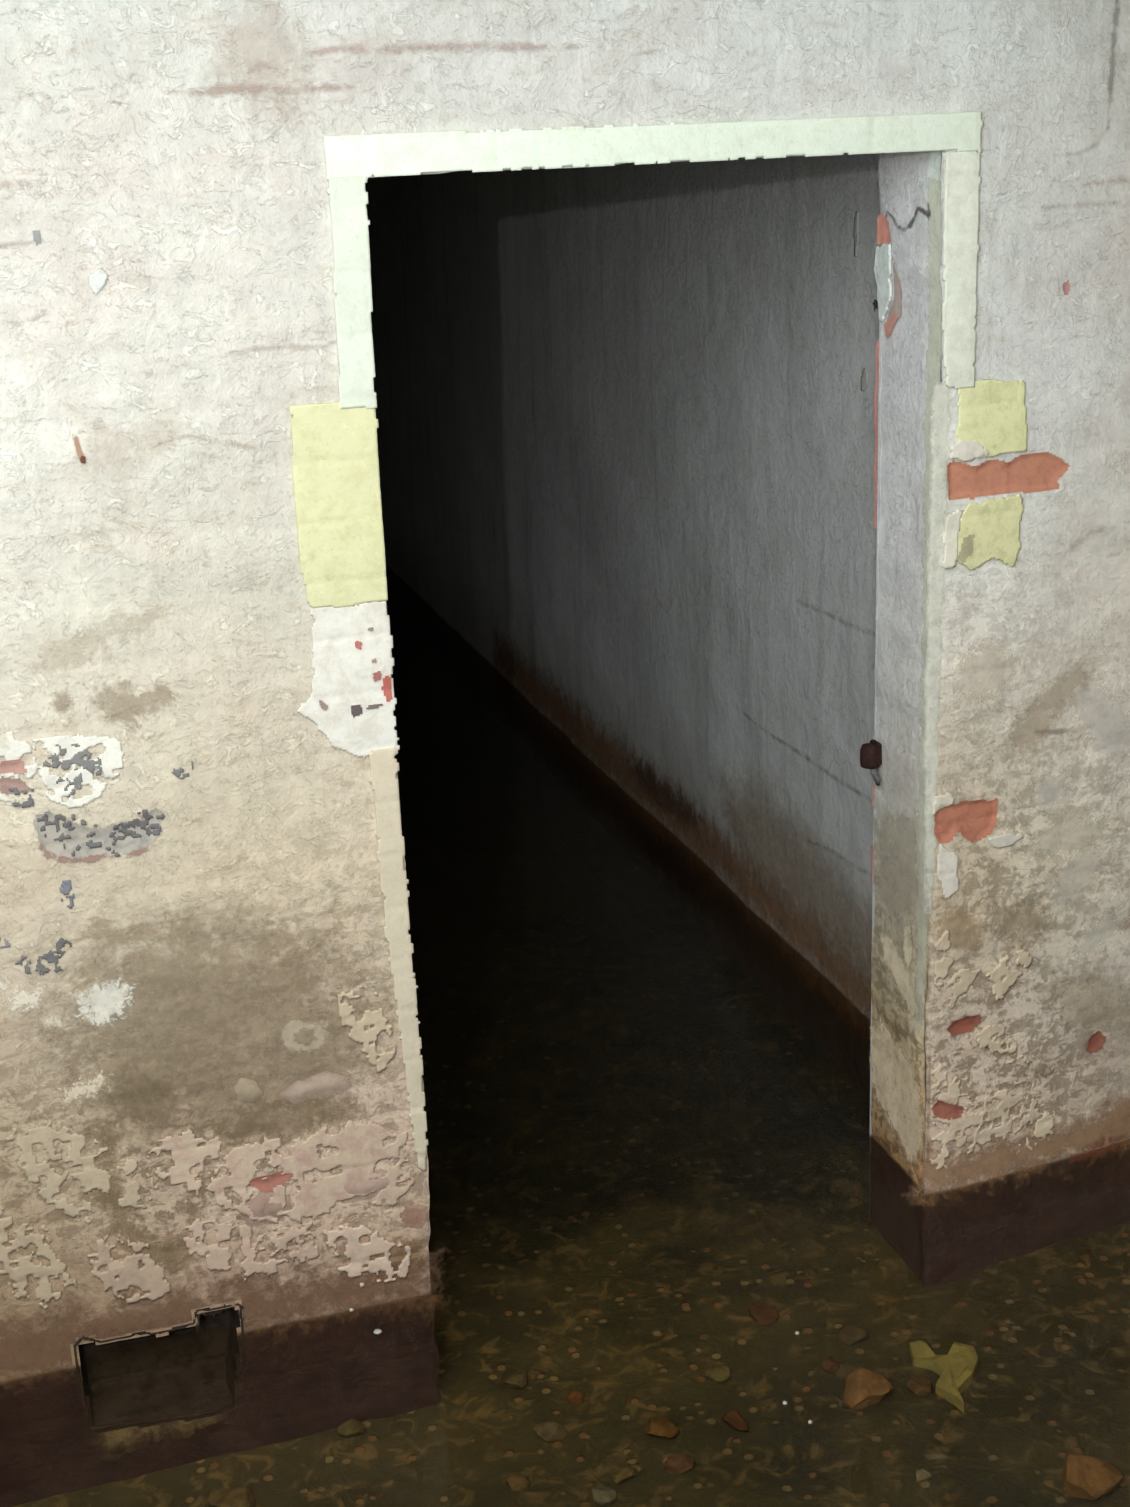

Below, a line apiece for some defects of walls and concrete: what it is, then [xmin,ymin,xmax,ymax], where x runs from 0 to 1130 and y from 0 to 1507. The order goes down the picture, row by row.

peeling [290,402,400,758]
peeling [869,181,1070,1170]
peeling [59,880,75,909]
flaking render [0,732,165,863]
water stain [494,638,872,1022]
peeling [0,937,140,1042]
peeling [280,985,396,1073]
flaking render [1086,1031,1106,1053]
peeling [0,1068,428,1310]
spalling [73,1303,245,1448]